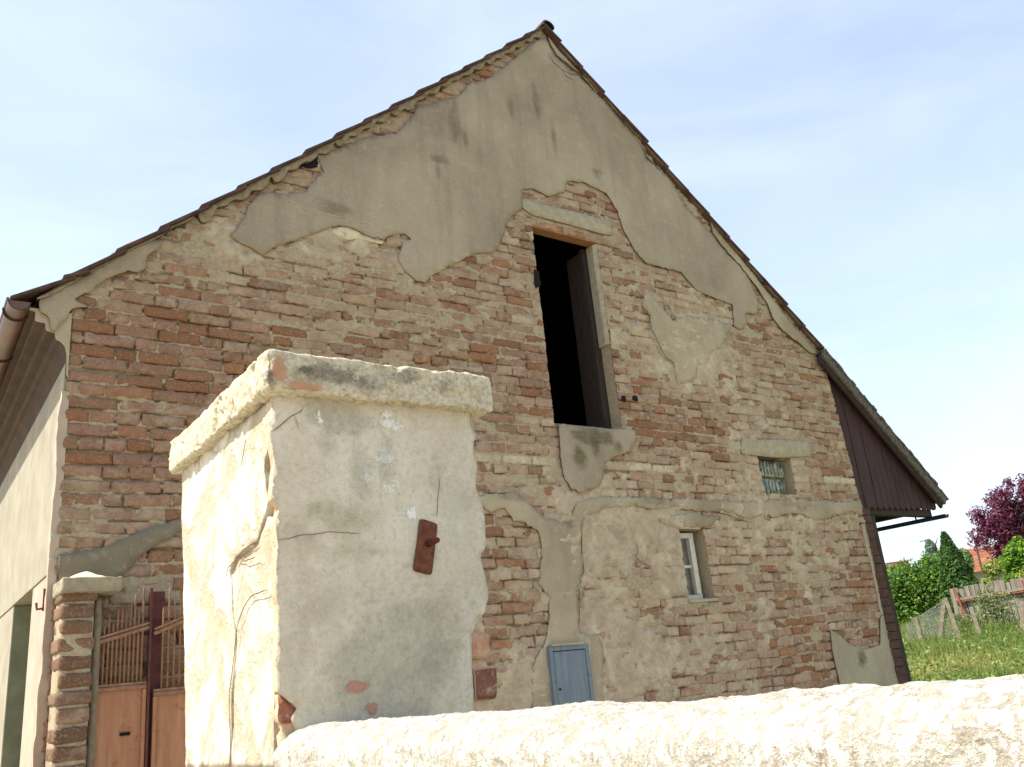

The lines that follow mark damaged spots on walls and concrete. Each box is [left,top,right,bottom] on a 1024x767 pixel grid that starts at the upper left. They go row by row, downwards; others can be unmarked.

peeling [230,37,817,355]
peeling [39,240,163,332]
spalling [271,354,324,391]
peeling [58,519,182,582]
crack [225,542,256,578]
crack [287,531,358,539]
peeling [479,424,899,708]
crack [229,590,266,767]
spalling [274,694,296,725]
spalling [470,631,497,701]